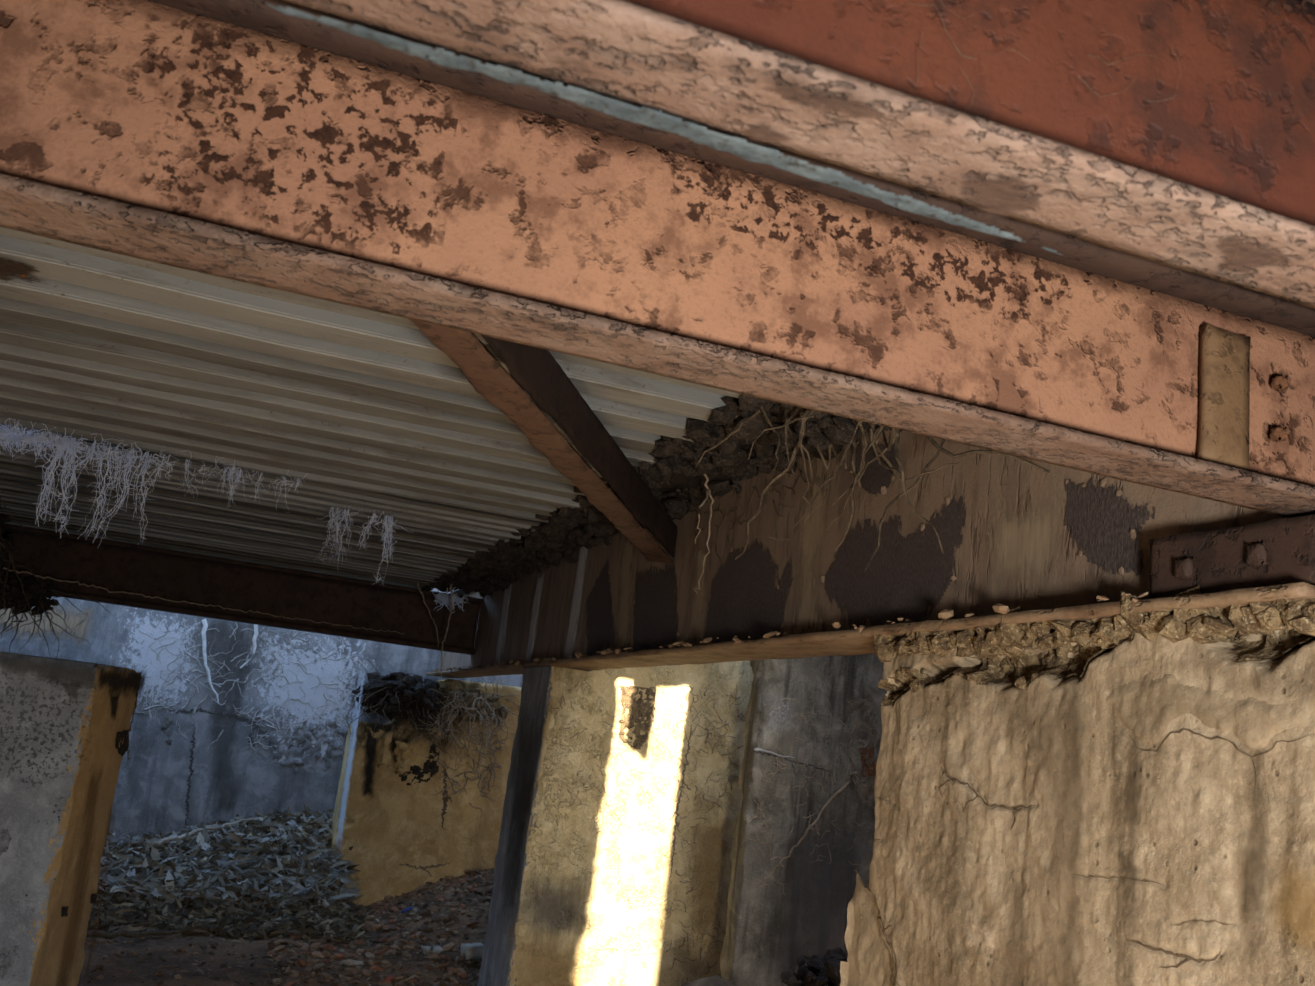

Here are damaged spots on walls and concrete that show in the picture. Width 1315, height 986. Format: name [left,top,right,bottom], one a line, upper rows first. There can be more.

rust [776,87,880,118]
rust [142,21,458,255]
rust [672,155,1071,322]
rust [1221,237,1287,271]
spalling [1221,625,1315,661]
spalling [399,744,440,786]
crack [938,767,1035,829]
crack [1126,920,1236,968]